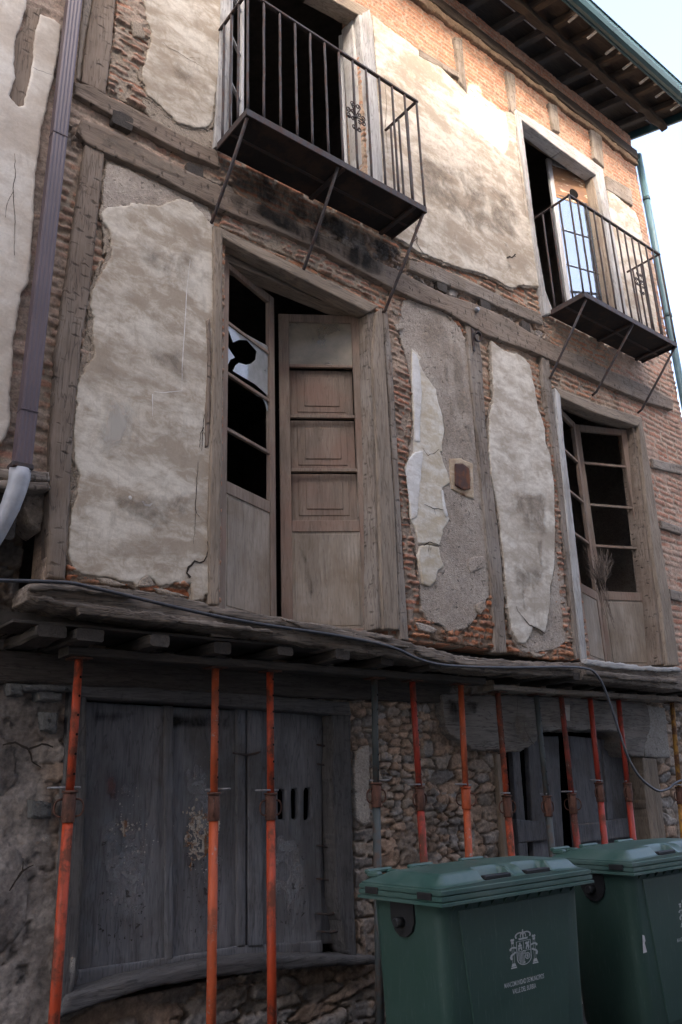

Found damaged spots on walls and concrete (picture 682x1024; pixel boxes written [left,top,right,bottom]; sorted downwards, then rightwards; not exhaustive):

spalling [106,0,151,112]
crack [5,154,16,255]
water stain [234,168,400,272]
flaking render [219,216,579,661]
crack [186,473,208,578]
spalling [65,565,190,599]
crack [3,741,53,768]